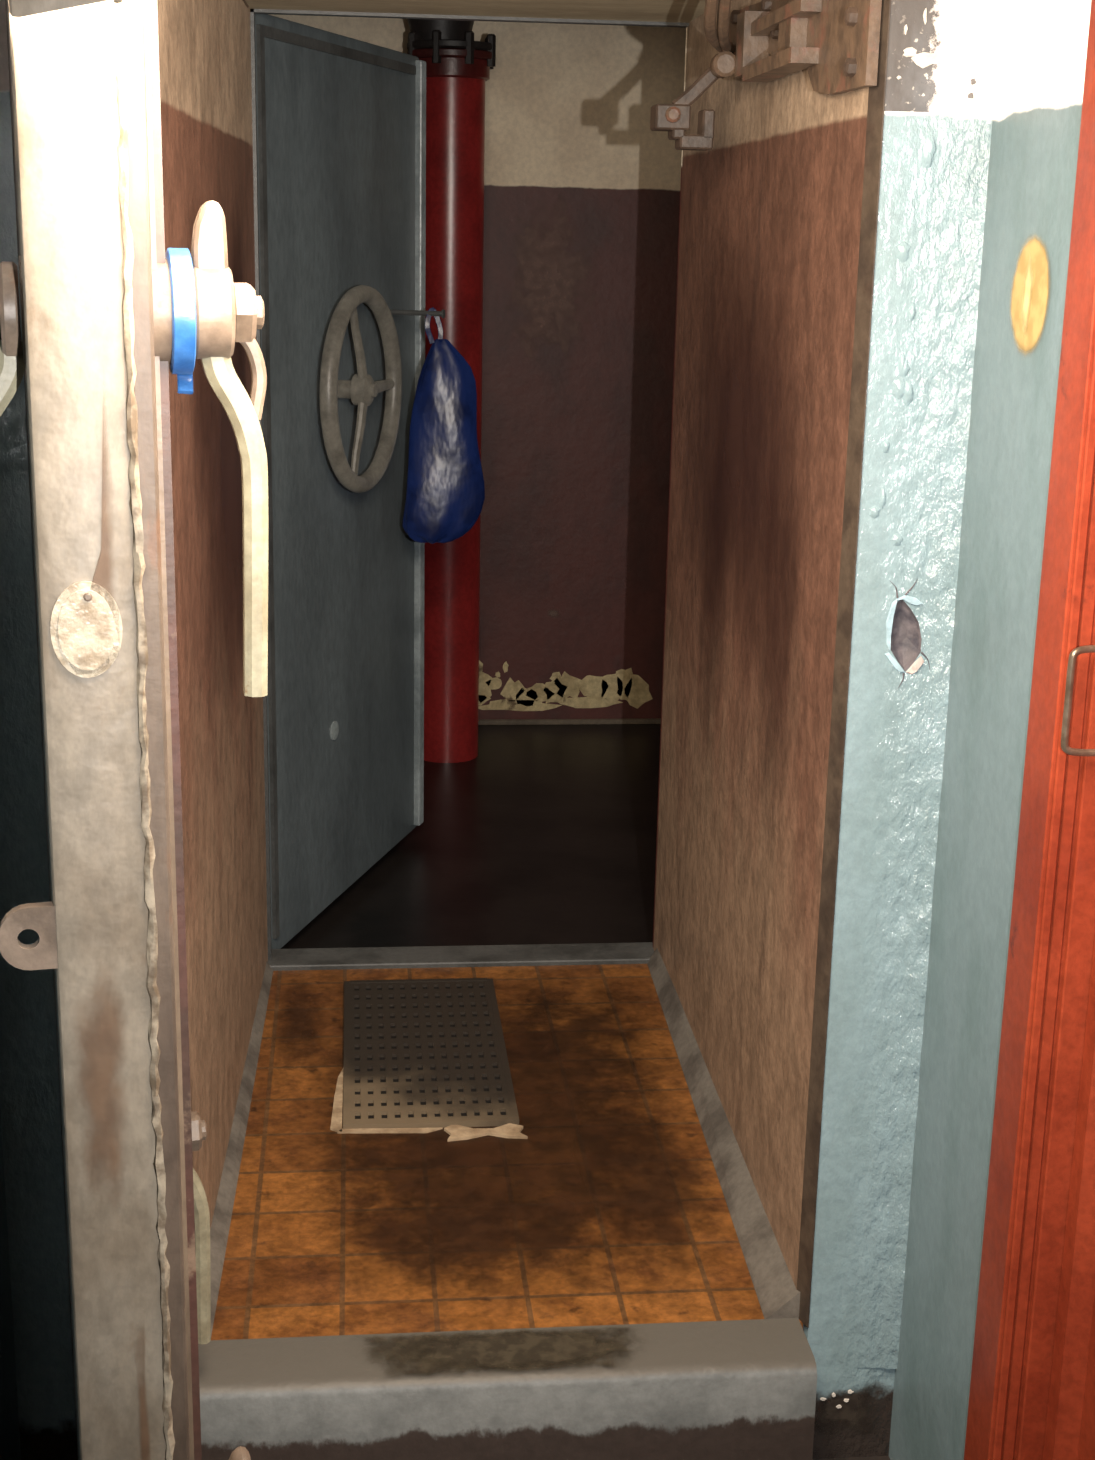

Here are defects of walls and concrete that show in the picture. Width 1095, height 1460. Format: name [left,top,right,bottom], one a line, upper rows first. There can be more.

hole [885,580,930,688]
water stain [333,993,695,1269]
water stain [411,1332,623,1367]